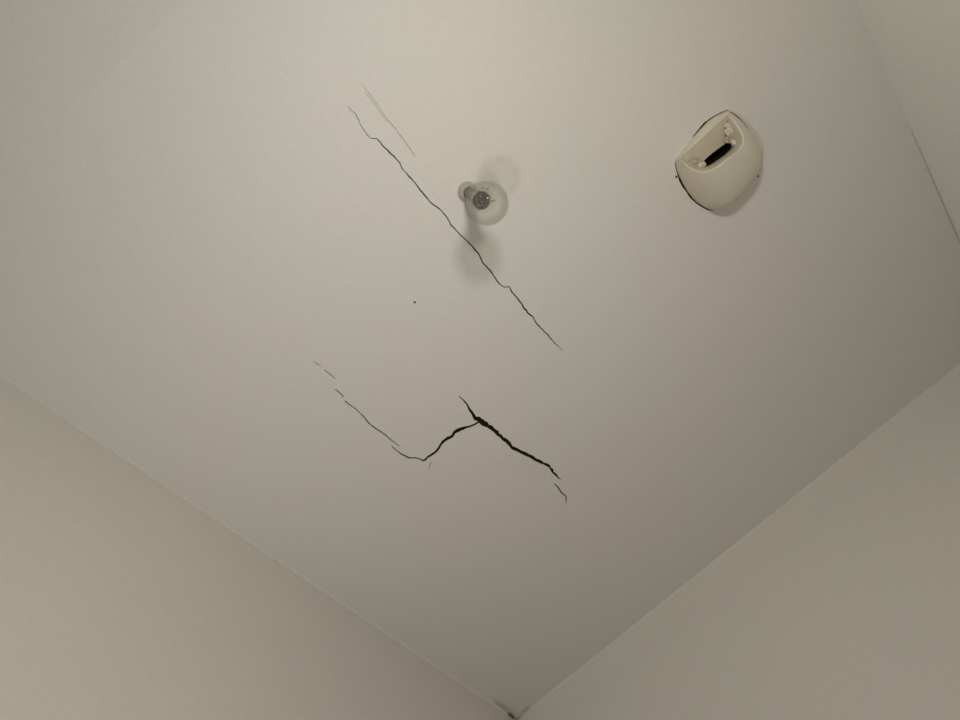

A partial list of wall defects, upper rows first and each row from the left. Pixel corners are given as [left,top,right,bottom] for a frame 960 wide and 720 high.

crack [348,84,559,347]
crack [315,362,567,500]